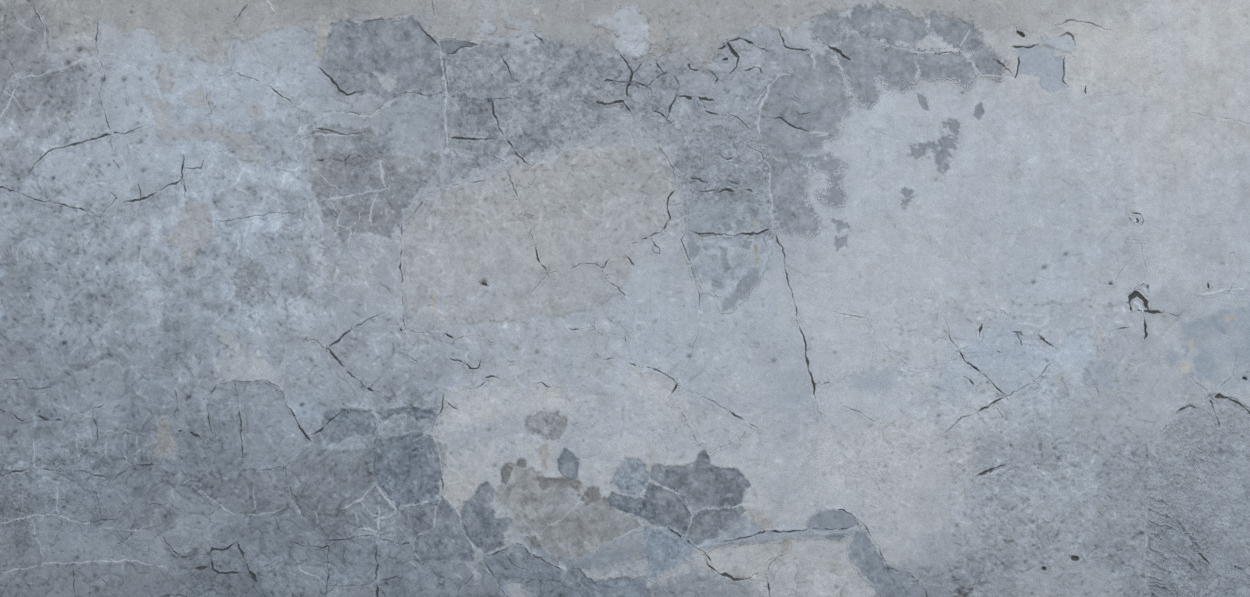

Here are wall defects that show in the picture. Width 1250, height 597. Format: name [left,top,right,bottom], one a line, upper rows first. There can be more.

peeling [305,0,1009,313]
crack [874,16,1117,98]
peeling [212,326,308,467]
crack [0,0,973,597]
peeling [321,370,981,597]
crack [904,306,1059,484]
spalling [1012,397,1250,597]
crack [1157,389,1250,435]